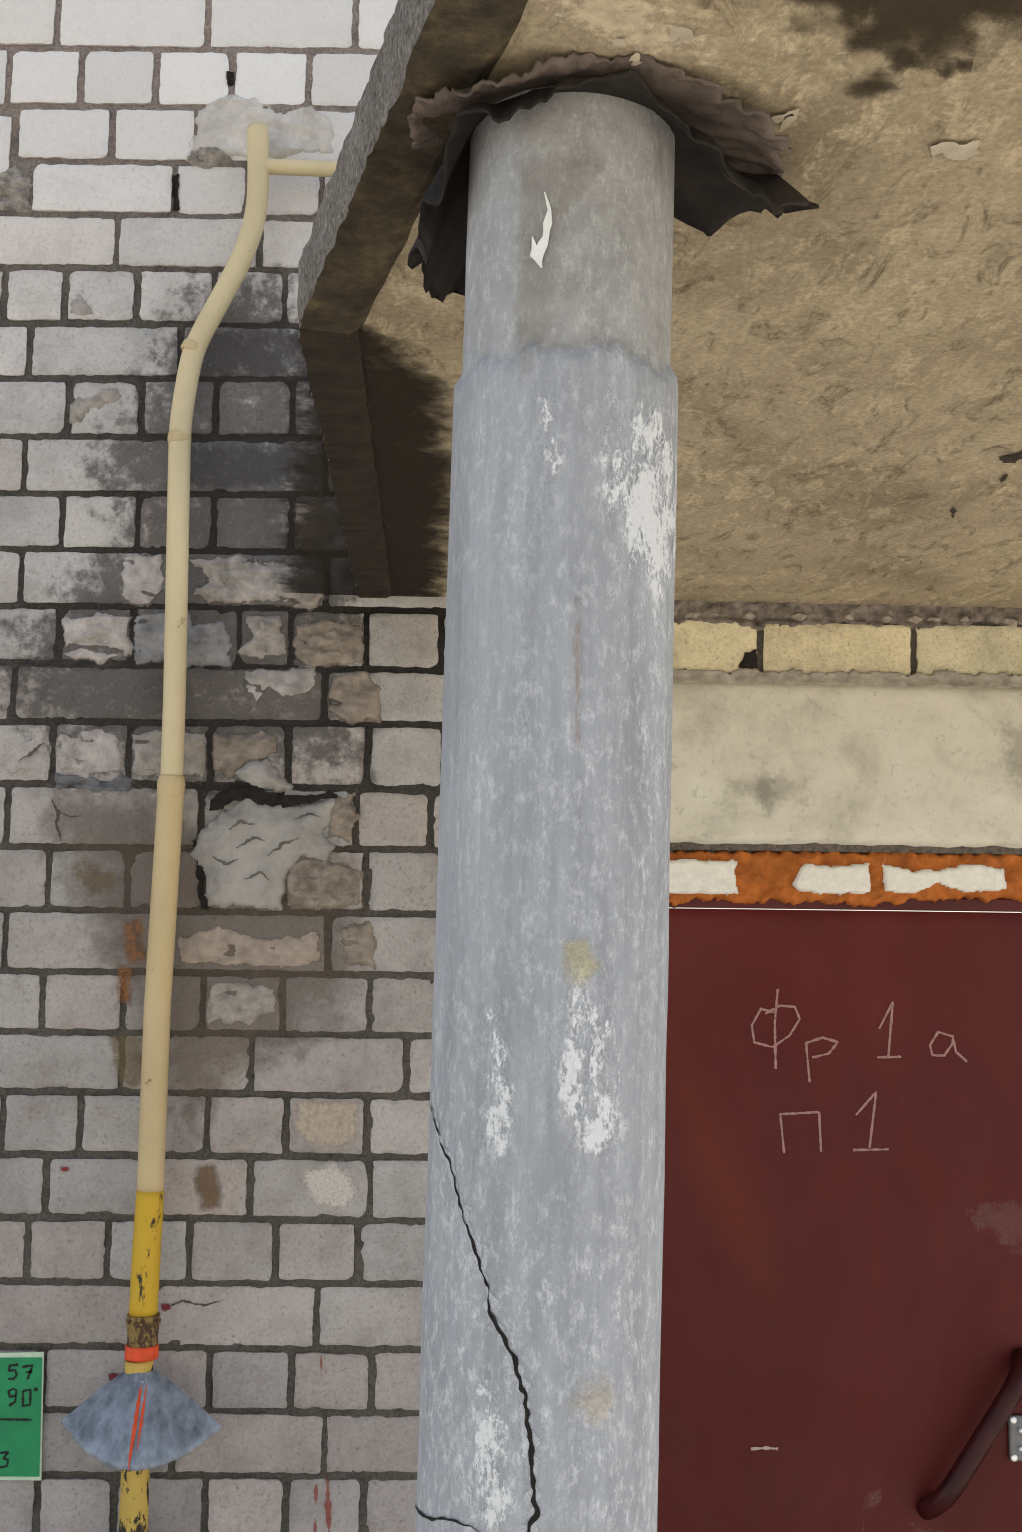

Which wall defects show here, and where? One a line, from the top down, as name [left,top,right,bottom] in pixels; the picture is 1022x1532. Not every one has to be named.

water stain [541,0,719,65]
water stain [795,0,1022,97]
crack [999,452,1022,483]
spalling [61,553,165,665]
spalling [186,553,382,726]
spalling [0,729,162,778]
spalling [183,729,338,811]
spalling [178,925,321,1026]
peeling [486,1009,514,1156]
peeling [557,963,623,1155]
crack [429,1095,542,1532]
crack [415,1506,479,1532]